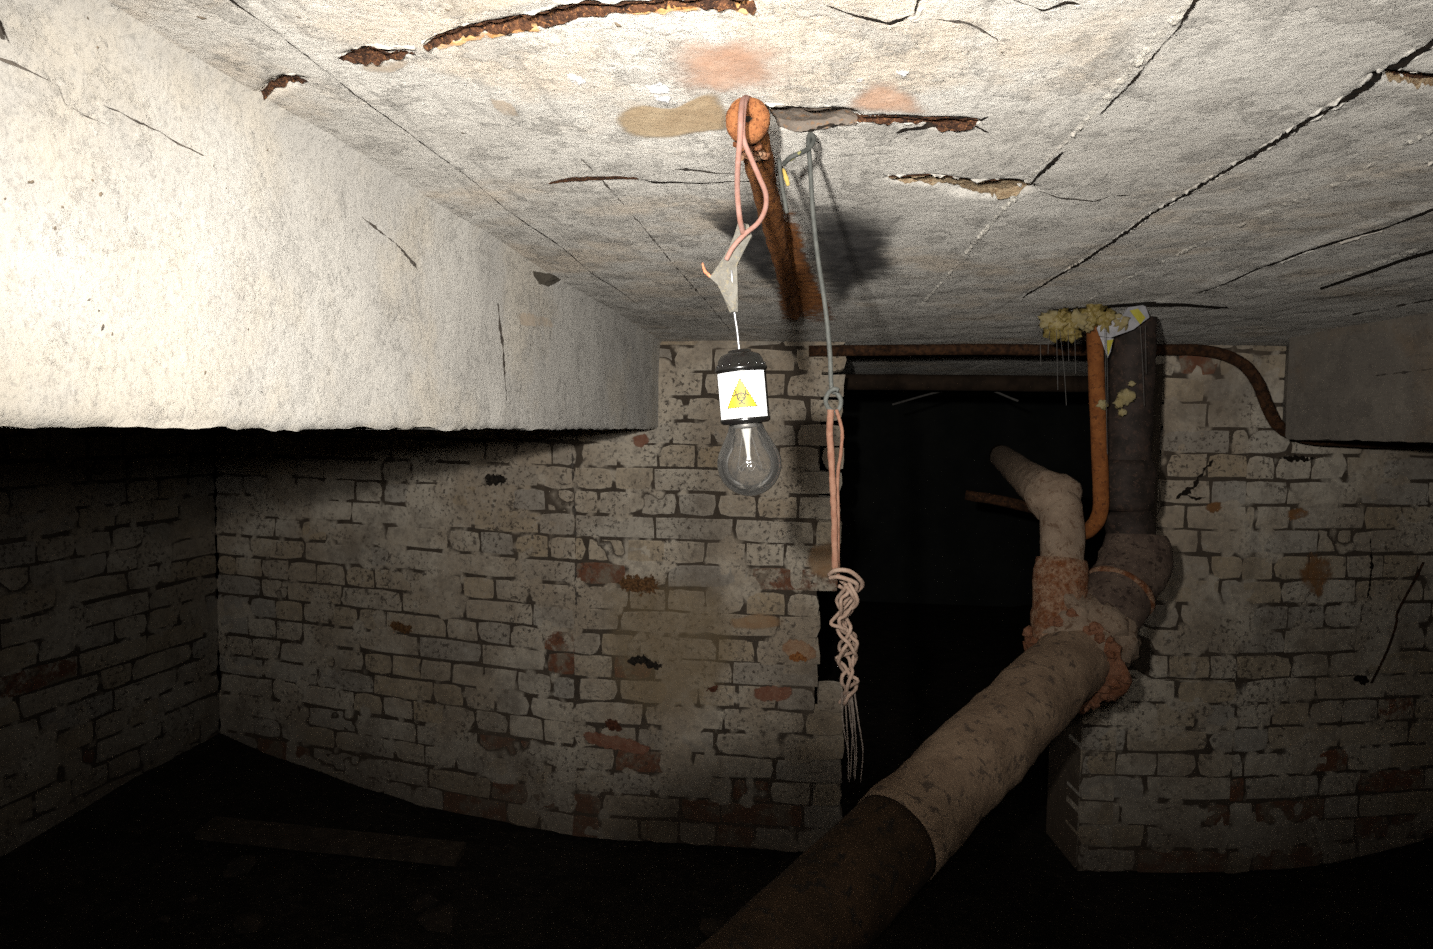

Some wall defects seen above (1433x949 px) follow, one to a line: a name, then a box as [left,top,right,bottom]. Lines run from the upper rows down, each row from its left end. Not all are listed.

crack [0,54,204,156]
spalling [259,73,308,100]
crack [230,0,757,301]
leakage [618,95,726,137]
rust [688,44,769,88]
spalling [766,102,989,133]
crack [827,0,1081,42]
spalling [887,173,1125,202]
crack [1100,0,1198,114]
crack [1022,39,1433,298]
crack [548,158,749,332]
crack [1198,208,1433,316]